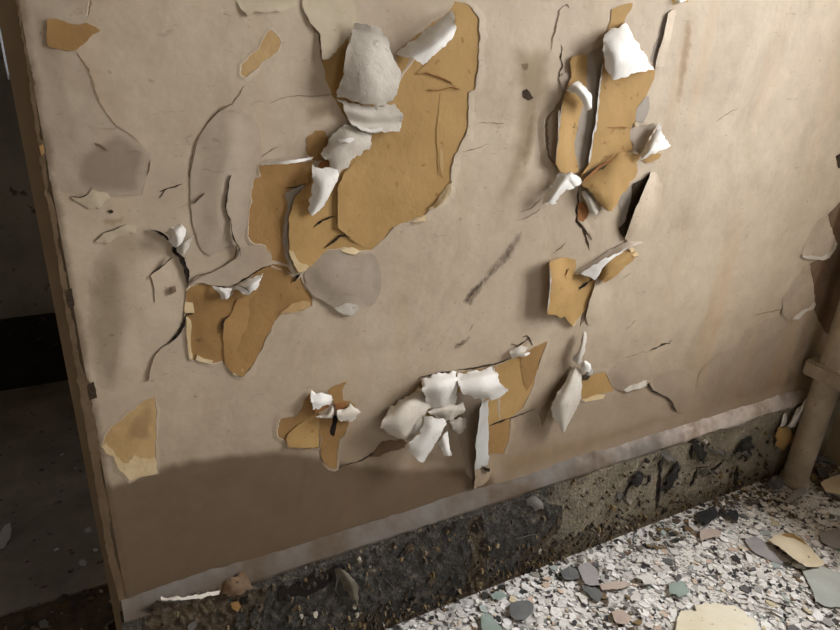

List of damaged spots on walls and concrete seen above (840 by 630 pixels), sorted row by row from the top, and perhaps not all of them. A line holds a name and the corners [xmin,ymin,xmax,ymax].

crack [149,224,192,286]
peeling [180,0,488,381]
peeling [370,0,688,489]
crack [575,186,595,250]
spalling [16,0,160,604]
crack [168,317,186,345]
peeling [694,202,840,403]
peeling [271,382,360,472]
crack [648,378,677,412]